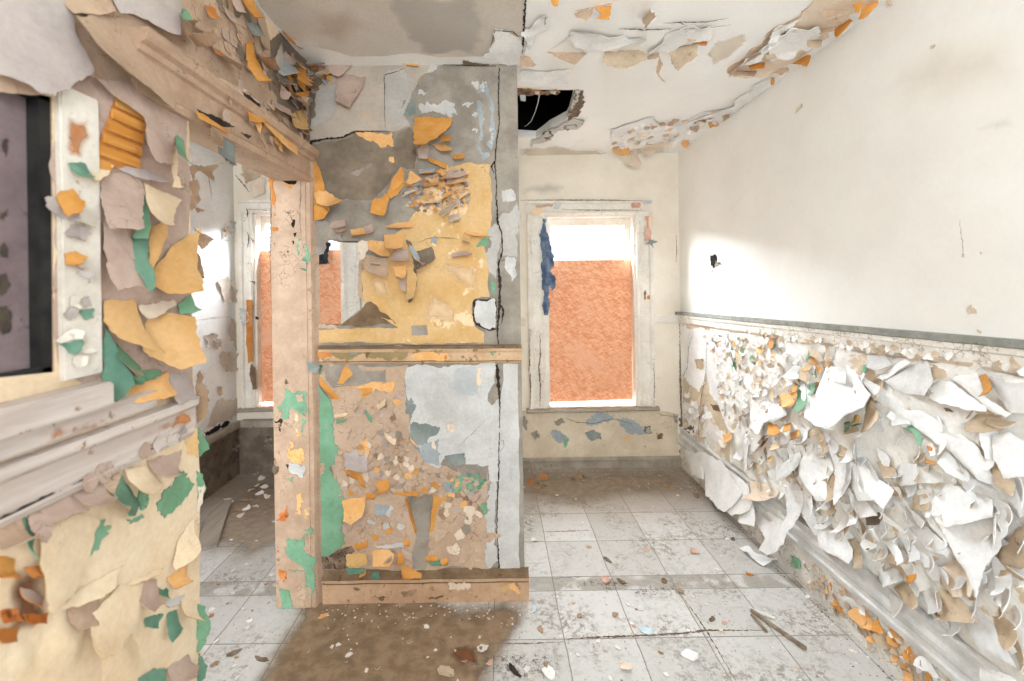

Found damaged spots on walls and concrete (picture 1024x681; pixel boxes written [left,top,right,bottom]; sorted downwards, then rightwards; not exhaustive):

peeling [610,0,892,167]
peeling [0,0,727,681]
crack [443,0,546,568]
crack [497,592,761,679]
peeling [278,324,1024,681]